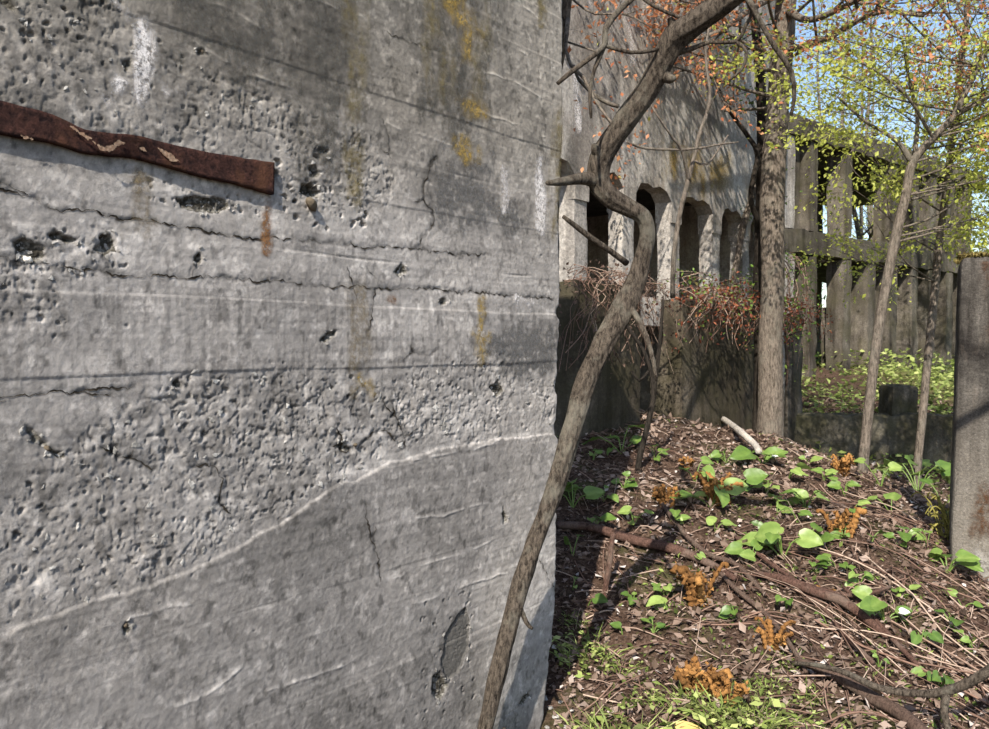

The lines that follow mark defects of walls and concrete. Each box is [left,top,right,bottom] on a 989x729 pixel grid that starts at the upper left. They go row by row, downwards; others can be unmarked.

water stain [115,20,156,103]
water stain [419,0,489,153]
spalling [175,190,239,216]
rust [261,211,271,255]
crack [0,157,551,332]
water stain [435,152,555,239]
crack [0,386,134,402]
crack [365,511,381,582]